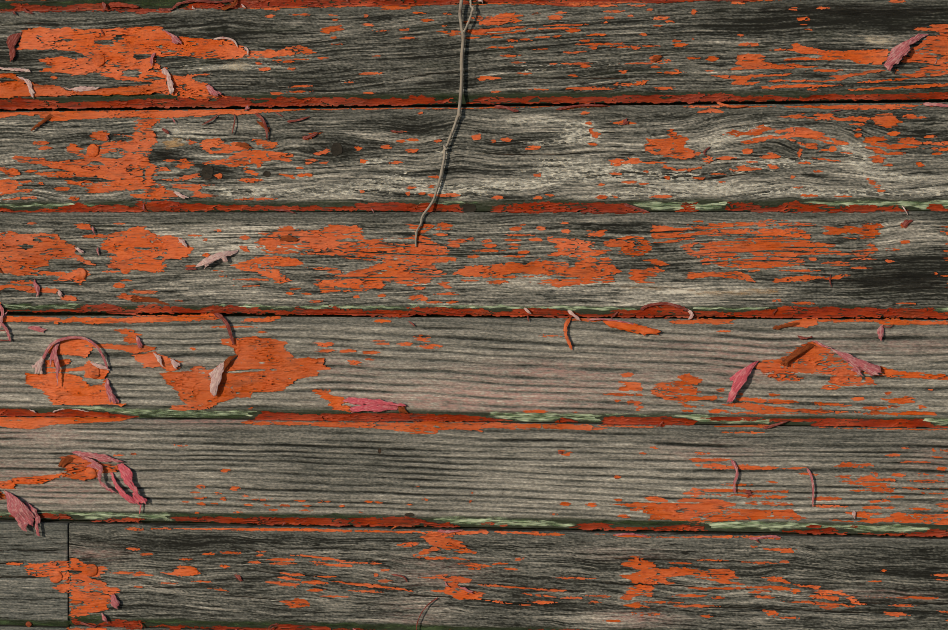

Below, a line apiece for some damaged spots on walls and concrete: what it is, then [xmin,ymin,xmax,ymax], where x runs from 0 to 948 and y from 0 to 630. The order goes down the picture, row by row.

peeling [0,0,948,434]
peeling [0,447,948,630]